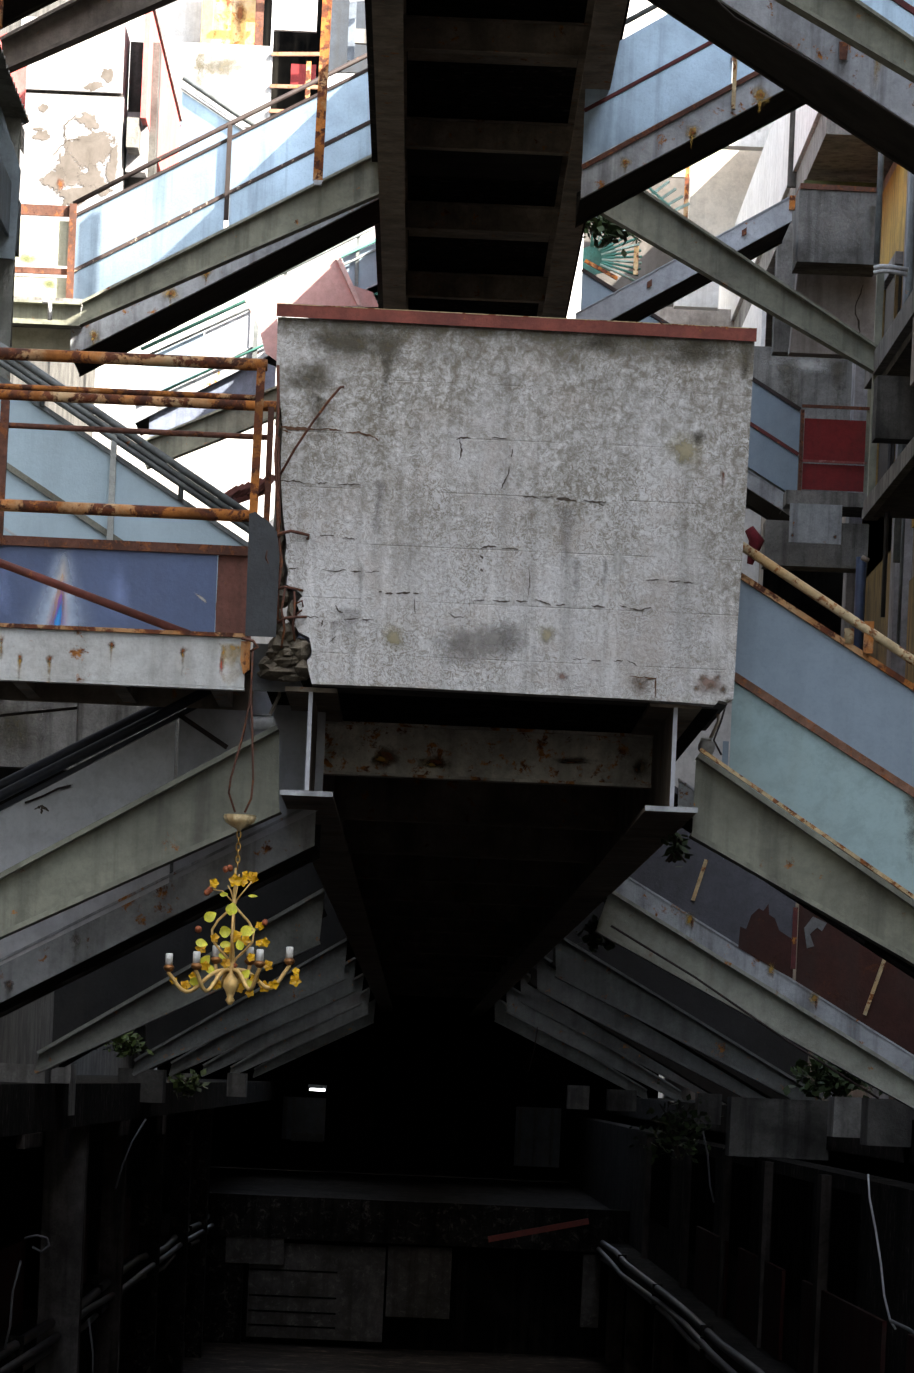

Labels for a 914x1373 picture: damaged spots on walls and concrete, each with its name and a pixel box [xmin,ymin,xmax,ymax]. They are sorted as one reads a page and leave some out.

corrosion [223,0,245,26]